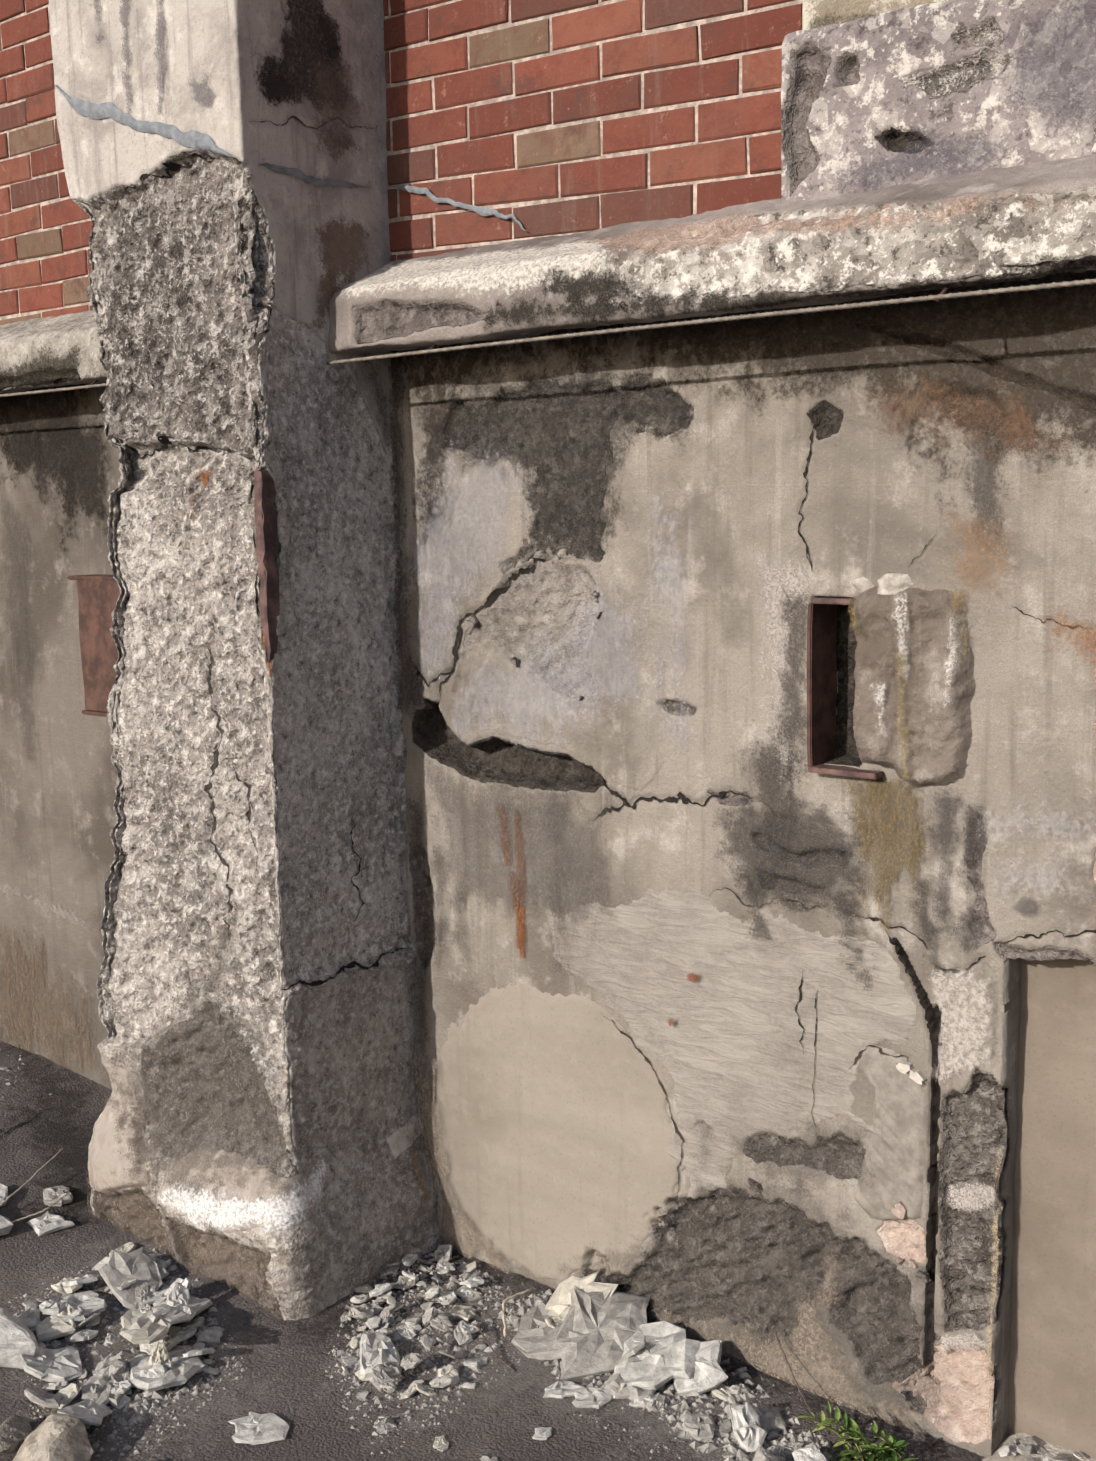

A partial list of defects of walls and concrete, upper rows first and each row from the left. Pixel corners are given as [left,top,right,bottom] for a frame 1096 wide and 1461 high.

water stain [154,0,166,114]
crack [55,85,527,231]
crack [240,203,272,358]
water stain [0,384,88,551]
spalling [441,373,694,701]
water stain [344,241,1096,723]
crack [798,411,825,574]
spalling [72,149,607,1319]
corrosion [497,805,526,958]
crack [709,888,1096,1367]
spalling [582,1069,1007,1445]
spalling [719,1402,804,1461]